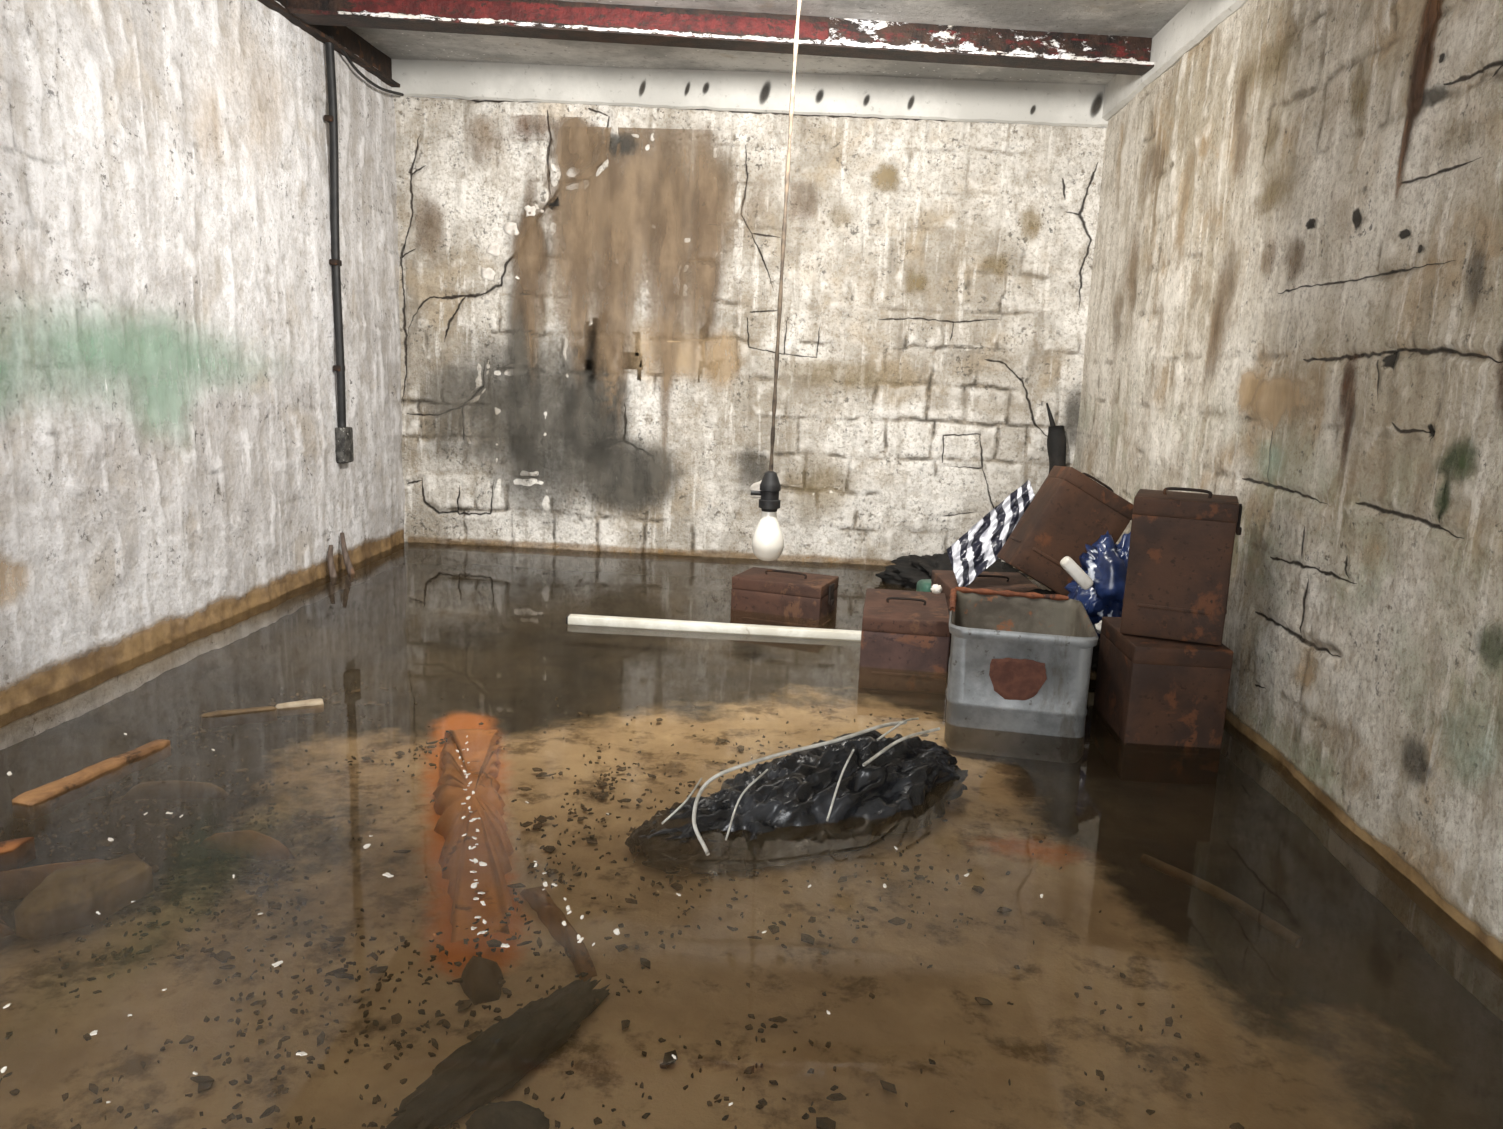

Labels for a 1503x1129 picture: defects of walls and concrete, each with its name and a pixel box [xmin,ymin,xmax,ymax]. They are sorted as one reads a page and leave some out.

crack [457,98,601,217]
crack [588,108,610,127]
corrosion [1397,0,1443,191]
crack [1402,157,1481,183]
crack [1444,61,1503,85]
crack [400,134,516,438]
damp [437,127,734,511]
crack [1278,260,1455,294]